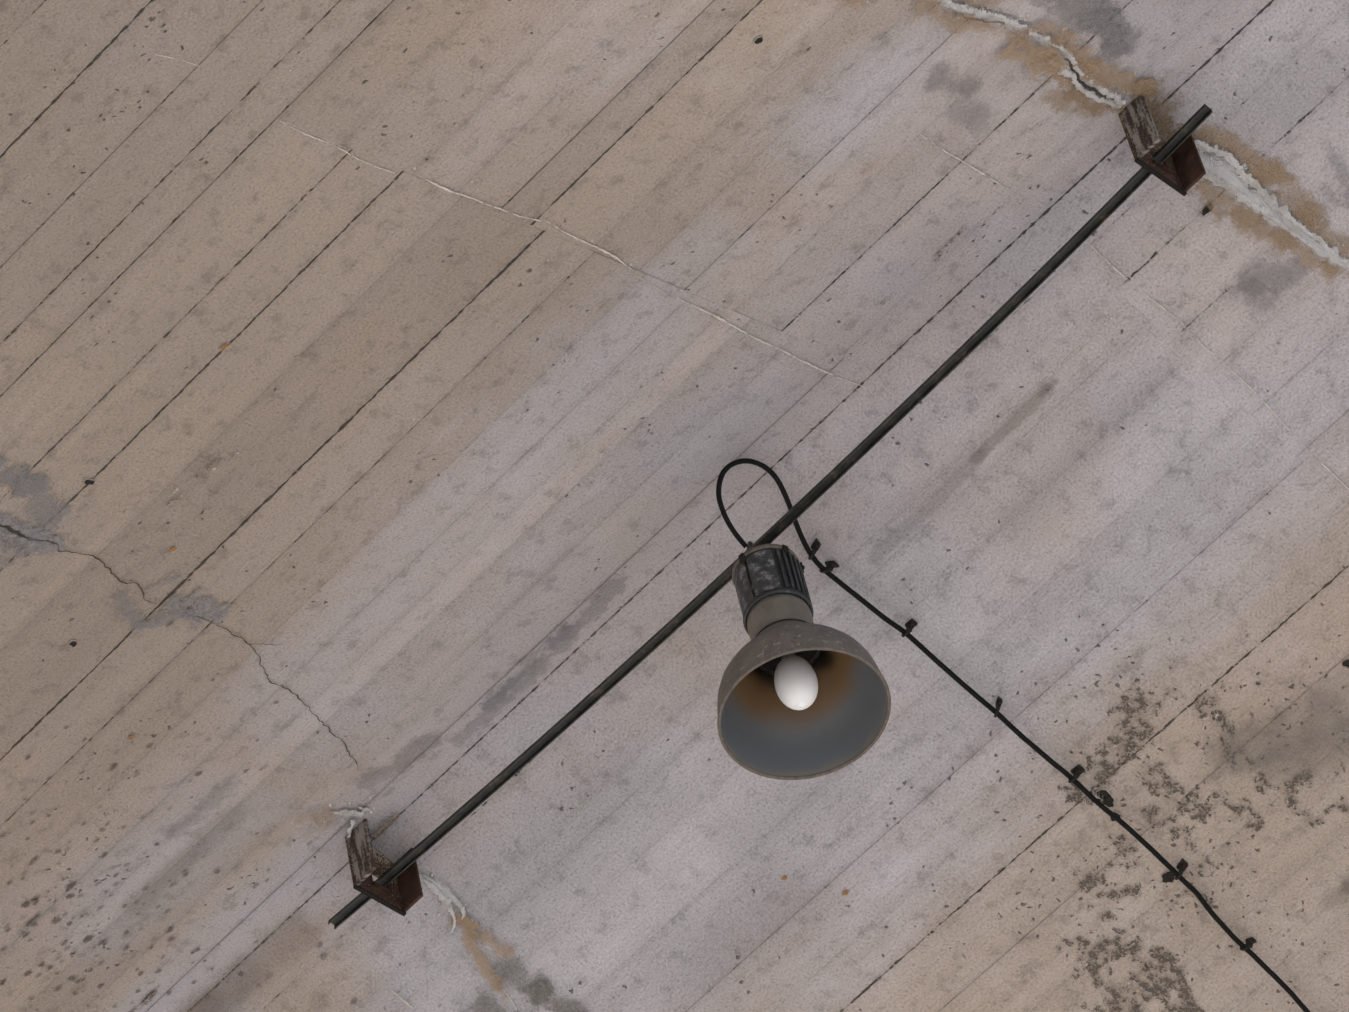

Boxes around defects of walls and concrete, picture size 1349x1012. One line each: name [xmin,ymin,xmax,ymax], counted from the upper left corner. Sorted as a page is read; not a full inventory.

crack [935,0,1136,110]
leakage [1047,0,1141,61]
leakage [0,459,74,553]
crack [0,525,156,604]
crack [188,614,358,770]
leakage [419,873,474,933]
leakage [474,960,587,1012]